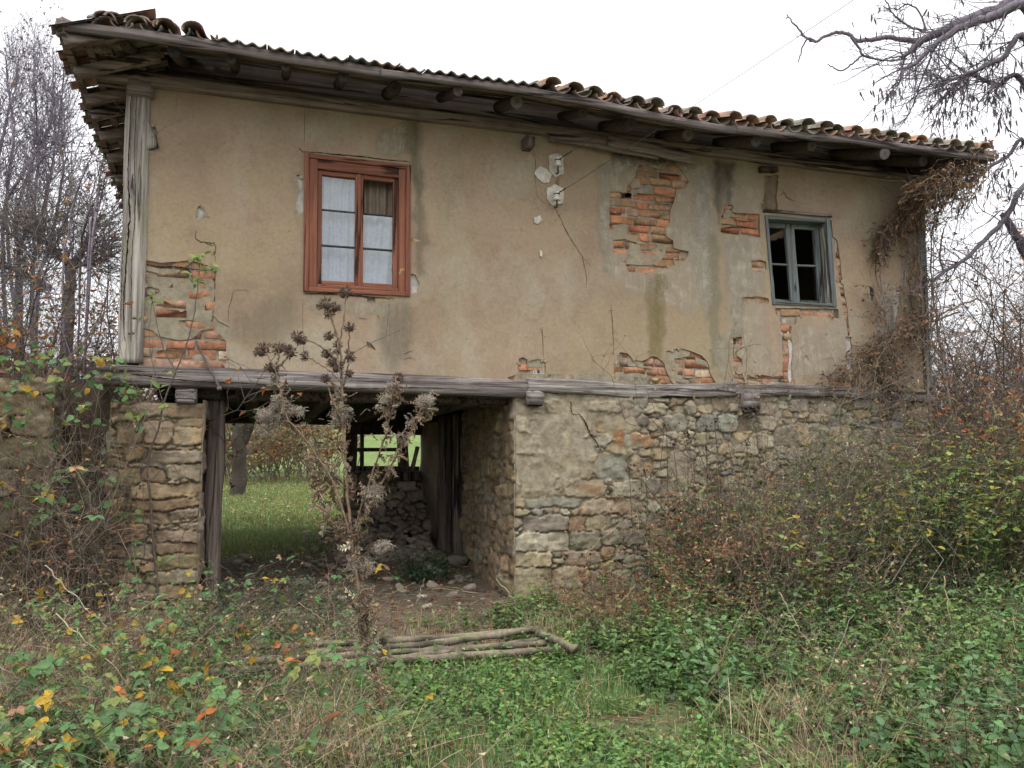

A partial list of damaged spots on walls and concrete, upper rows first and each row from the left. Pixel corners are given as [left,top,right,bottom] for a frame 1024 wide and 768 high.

spalling [609,164,688,274]
spalling [720,175,781,238]
crack [146,233,216,280]
spalling [142,258,229,368]
spalling [732,242,854,387]
spalling [508,358,548,380]
spalling [611,347,715,385]